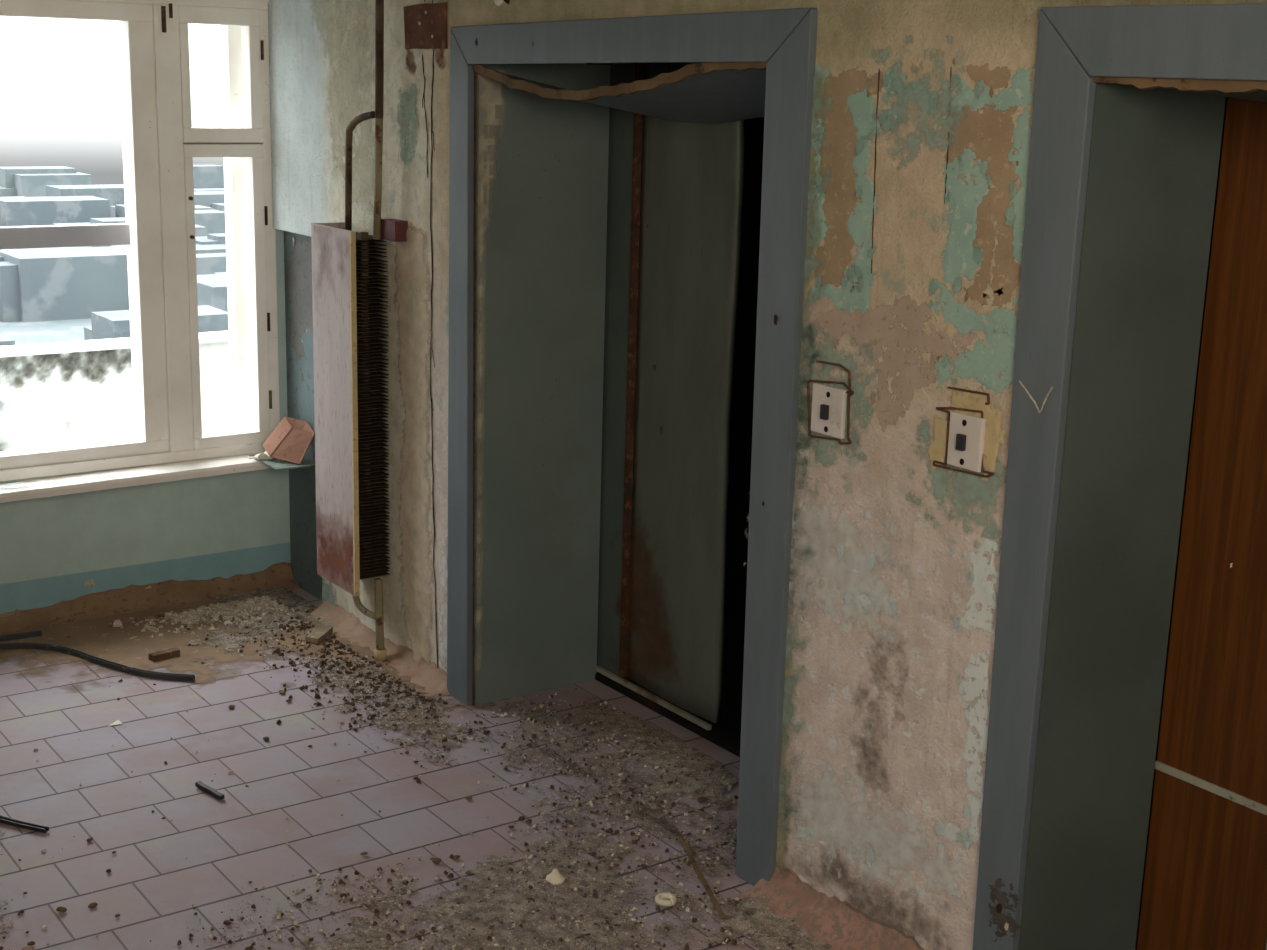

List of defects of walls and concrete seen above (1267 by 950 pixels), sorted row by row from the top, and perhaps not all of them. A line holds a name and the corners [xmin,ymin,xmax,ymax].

corrosion [619,113,643,678]
water stain [822,852,924,937]
peeling [989,878,1023,942]